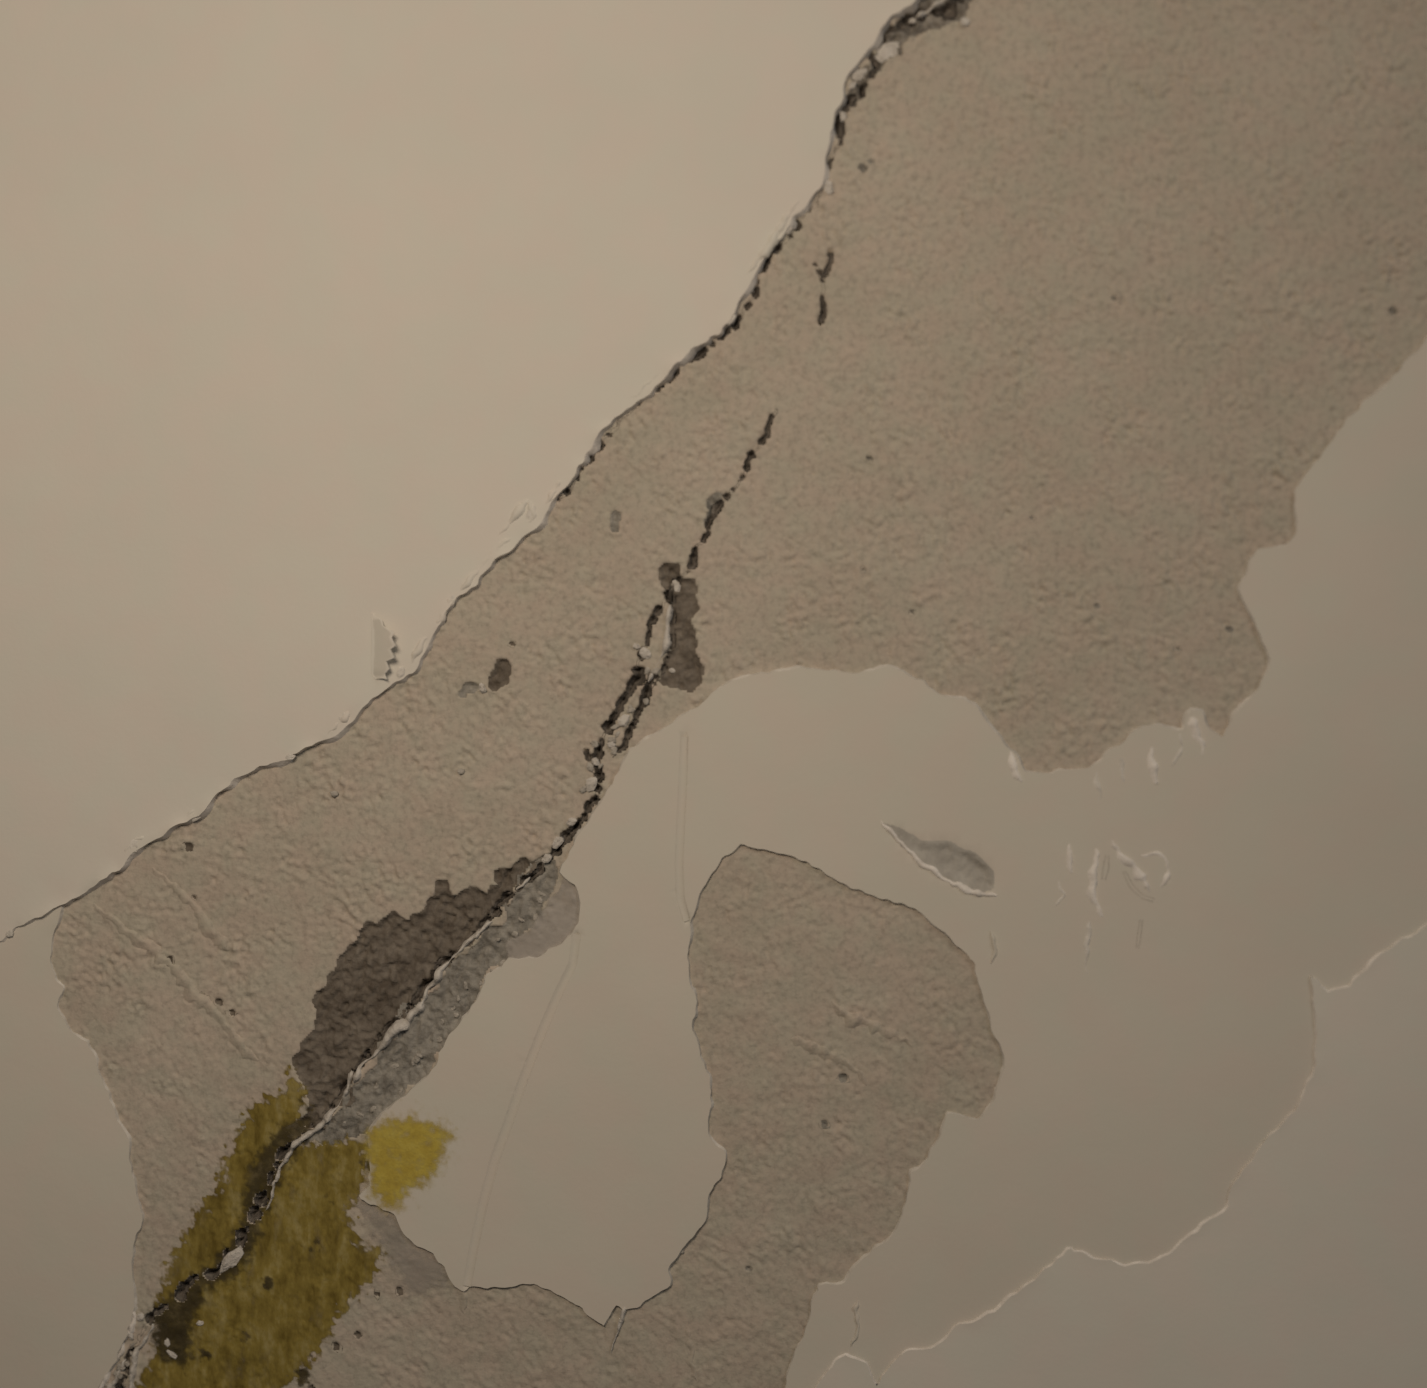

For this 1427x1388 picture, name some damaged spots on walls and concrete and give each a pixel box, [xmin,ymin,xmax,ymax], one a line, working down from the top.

spalling [877,0,971,55]
crack [557,0,970,502]
peeling [372,613,396,679]
crack [99,408,778,1388]
peeling [549,792,606,898]
spalling [881,821,997,897]
spalling [50,907,145,1324]
water stain [134,1065,453,1388]
peeling [281,844,1005,1388]
peeling [815,923,1427,1388]